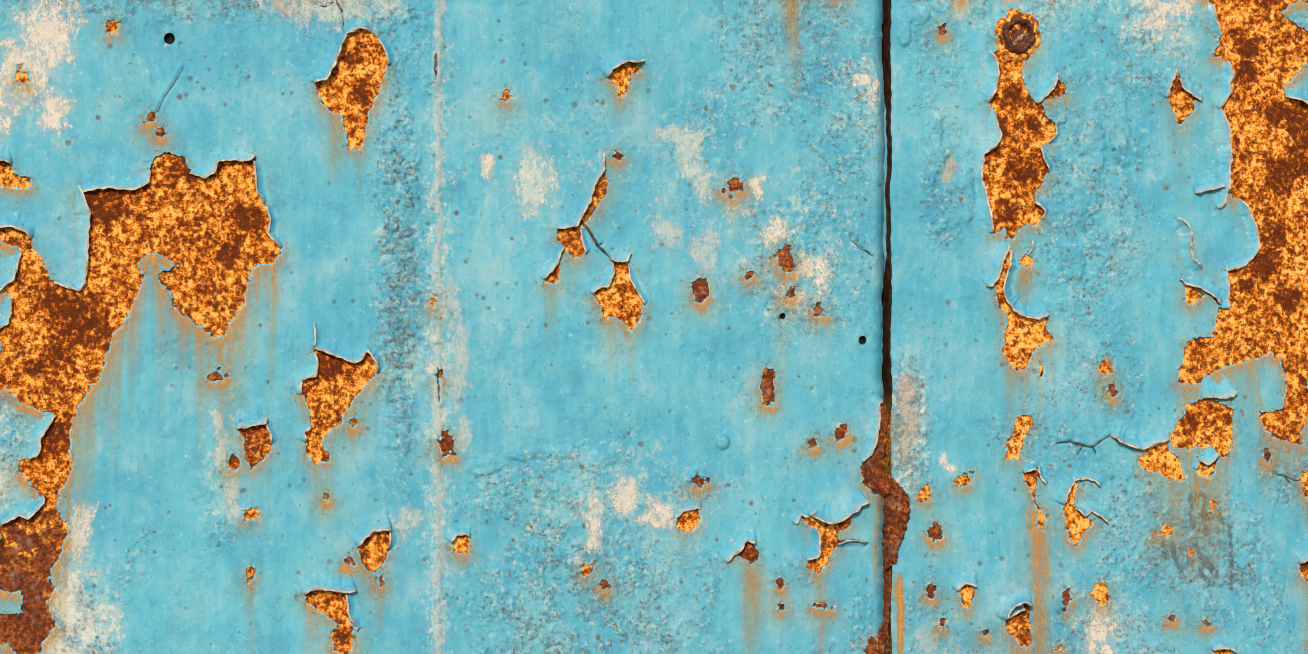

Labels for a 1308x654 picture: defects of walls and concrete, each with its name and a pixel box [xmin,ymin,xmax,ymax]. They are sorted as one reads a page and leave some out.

peeling [311,15,397,155]
peeling [537,151,609,284]
peeling [587,248,650,337]
peeling [970,48,1067,376]
peeling [1110,0,1308,505]
peeling [0,142,284,654]
peeling [226,323,389,474]
peeling [299,511,400,654]
peeling [788,394,891,579]
peeling [949,570,979,616]
peeling [990,415,1113,654]
peeling [1294,527,1308,584]